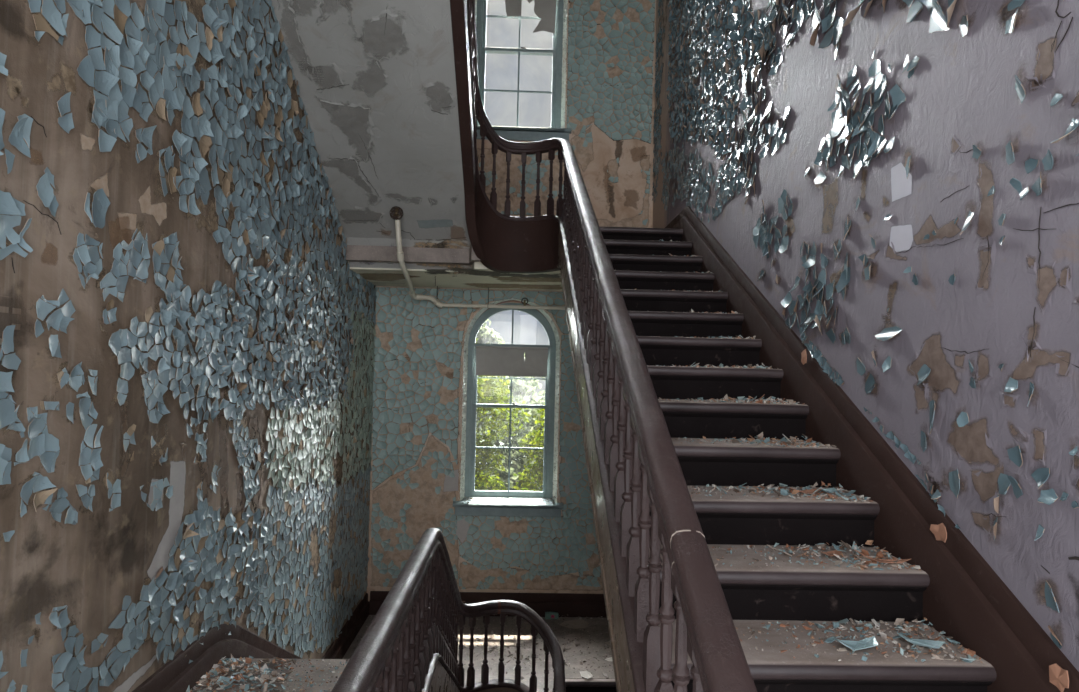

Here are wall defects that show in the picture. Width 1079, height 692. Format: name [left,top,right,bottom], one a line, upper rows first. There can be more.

peeling [998,0,1025,34]
peeling [0,52,33,174]
peeling [0,190,33,260]
peeling [567,0,1006,395]
flaking render [1005,38,1079,200]
peeling [0,289,121,525]
peeling [20,0,603,692]
flaking render [864,255,1079,540]
peeling [0,650,28,692]